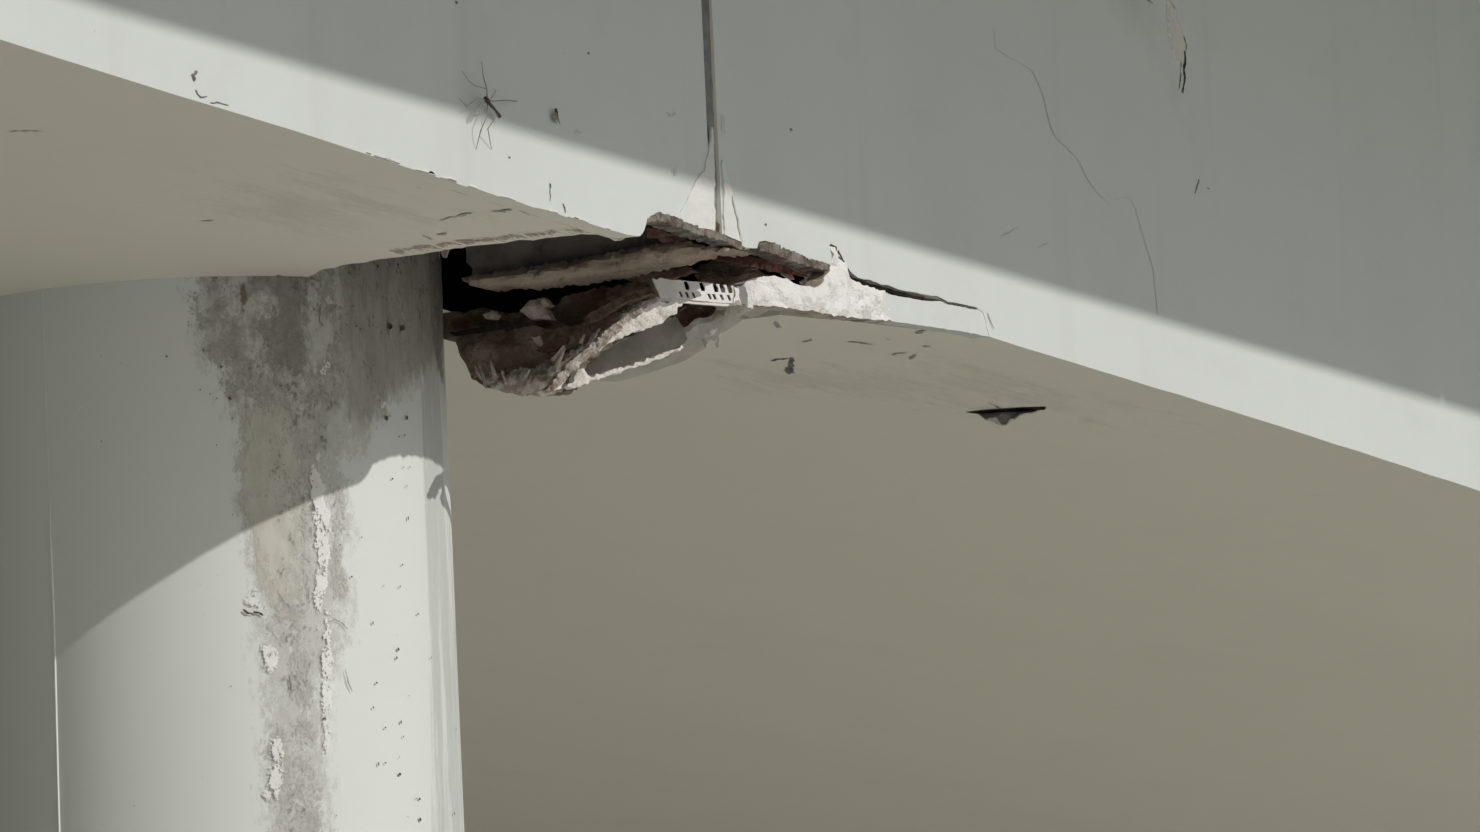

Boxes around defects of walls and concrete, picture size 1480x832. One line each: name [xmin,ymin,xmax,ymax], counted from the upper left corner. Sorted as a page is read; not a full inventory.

peeling [1166,0,1187,94]
crack [732,196,743,242]
crack [994,32,1158,311]
flaking render [440,209,989,397]
crack [773,339,812,374]
crack [831,244,994,360]
peeling [966,403,1046,426]
damp [188,251,443,832]